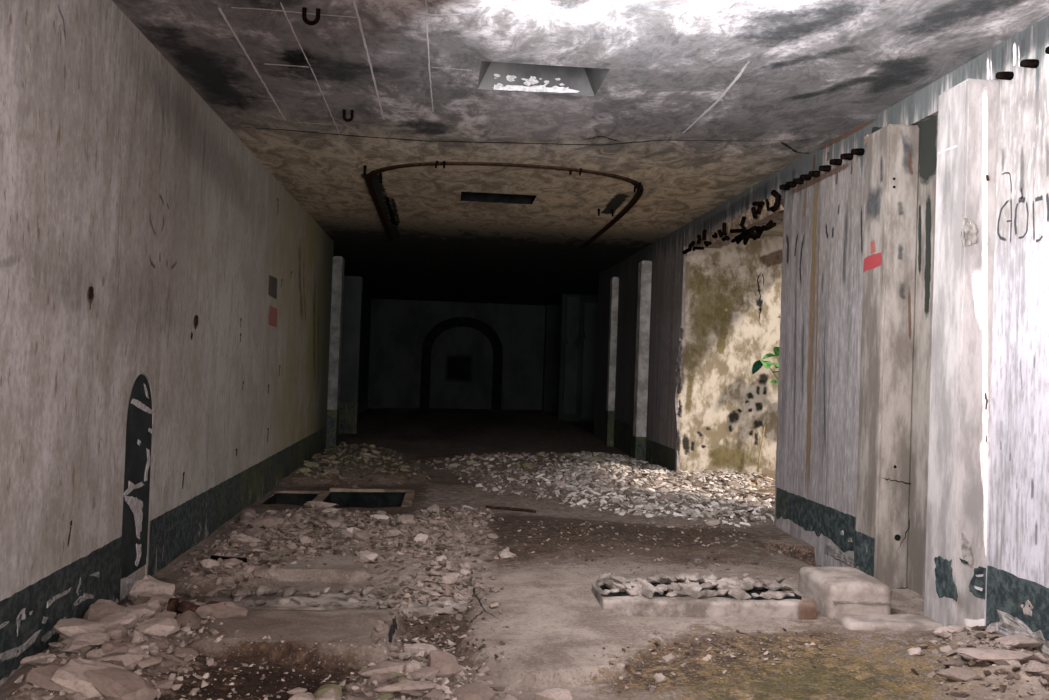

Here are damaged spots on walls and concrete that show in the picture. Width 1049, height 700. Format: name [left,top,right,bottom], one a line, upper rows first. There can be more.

leakage [153,30,255,106]
peeling [492,74,579,93]
leakage [686,265,763,411]
peeling [131,384,155,415]
leakage [682,427,710,454]
leakage [728,374,768,444]
peeling [123,428,153,566]
peeling [0,572,100,662]
peeling [116,578,138,604]
peeling [934,533,986,602]